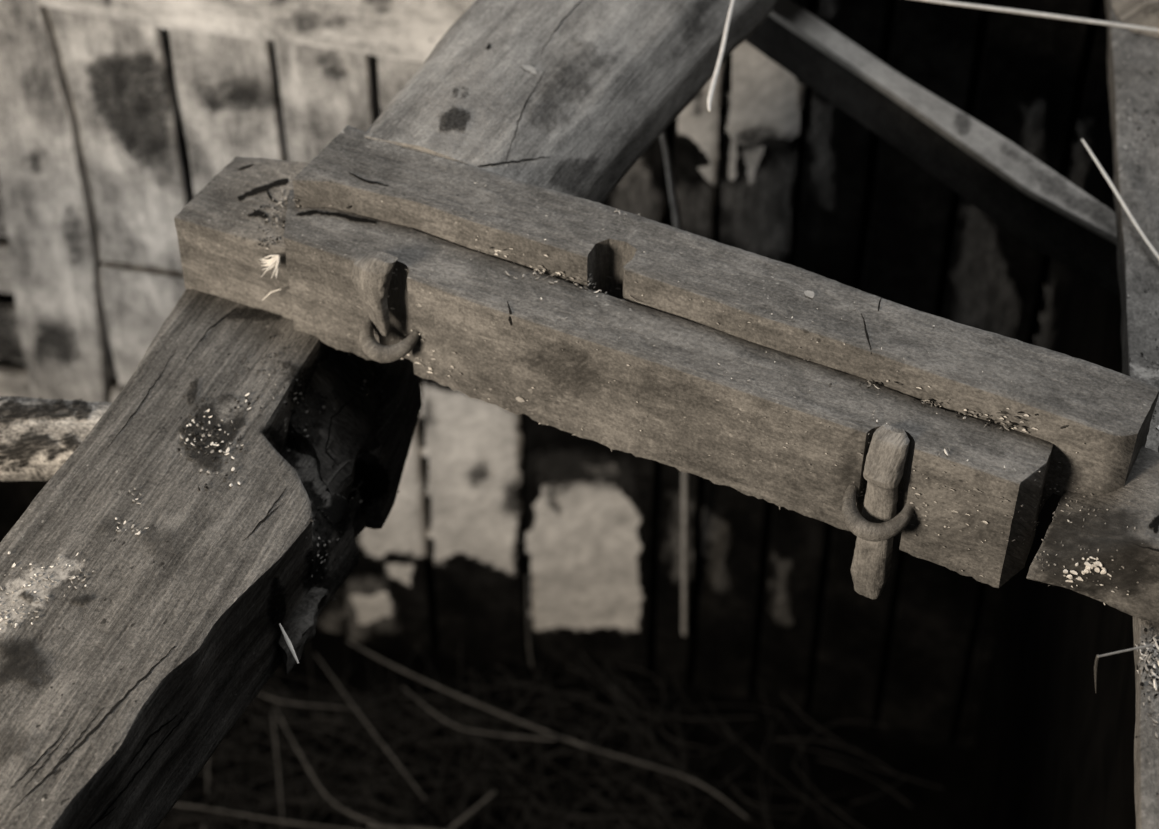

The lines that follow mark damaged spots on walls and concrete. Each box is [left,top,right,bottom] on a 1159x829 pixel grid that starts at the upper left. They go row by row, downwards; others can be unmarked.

crack [477,0,582,167]
crack [10,646,176,810]
crack [89,712,189,829]